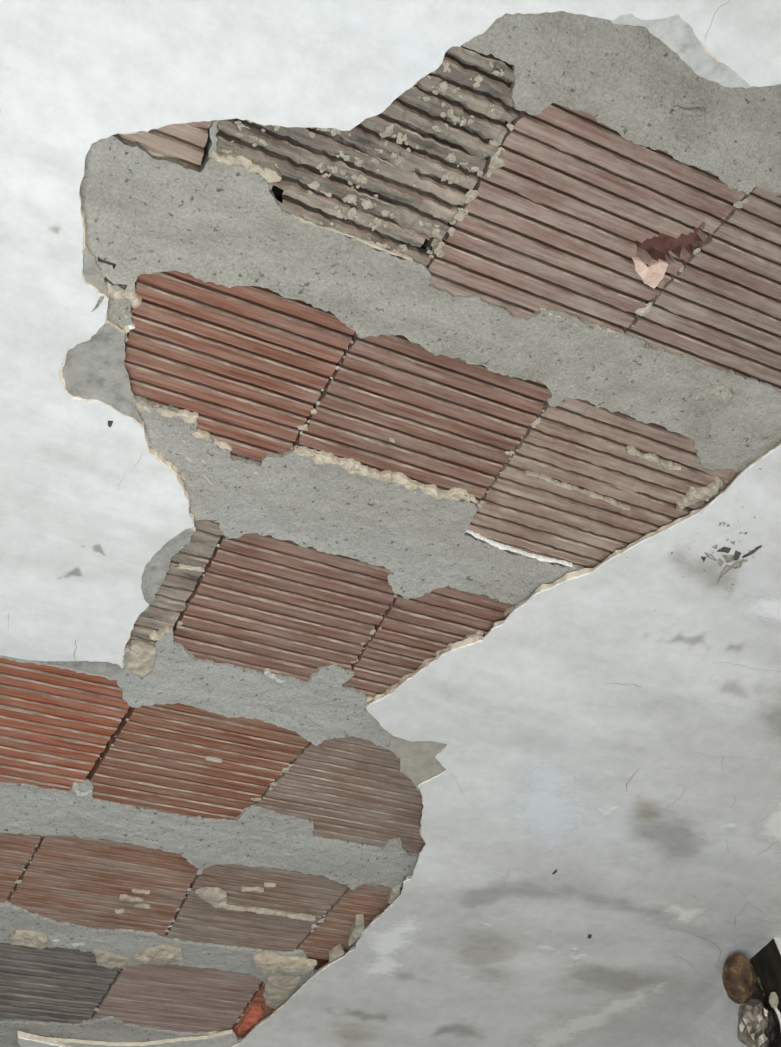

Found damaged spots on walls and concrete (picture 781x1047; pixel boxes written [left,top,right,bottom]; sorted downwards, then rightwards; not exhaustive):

peeling [62,320,143,425]
spalling [80,11,781,697]
spalling [0,626,426,1047]
peeling [369,713,447,791]